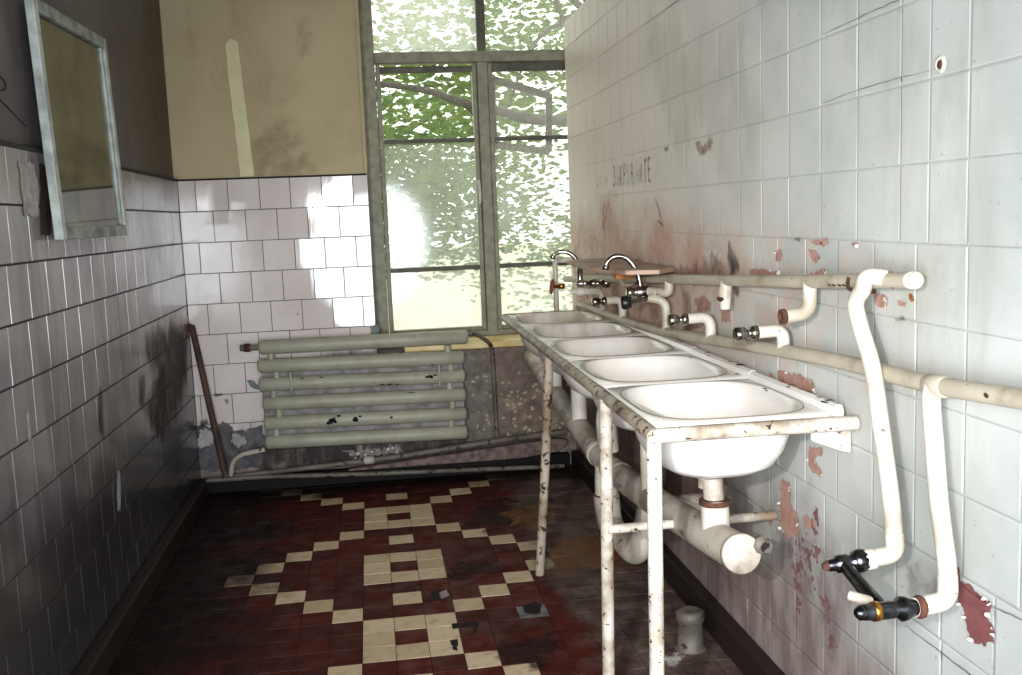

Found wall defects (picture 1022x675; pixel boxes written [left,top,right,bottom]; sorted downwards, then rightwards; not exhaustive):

crack [824,0,898,34]
crack [823,71,926,103]
peeling [749,249,782,275]
peeling [808,237,829,275]
peeling [695,296,730,323]
peeling [769,370,816,395]
spalling [196,421,265,473]
peeling [806,445,822,477]
peeling [769,479,815,540]
peeling [956,567,995,647]